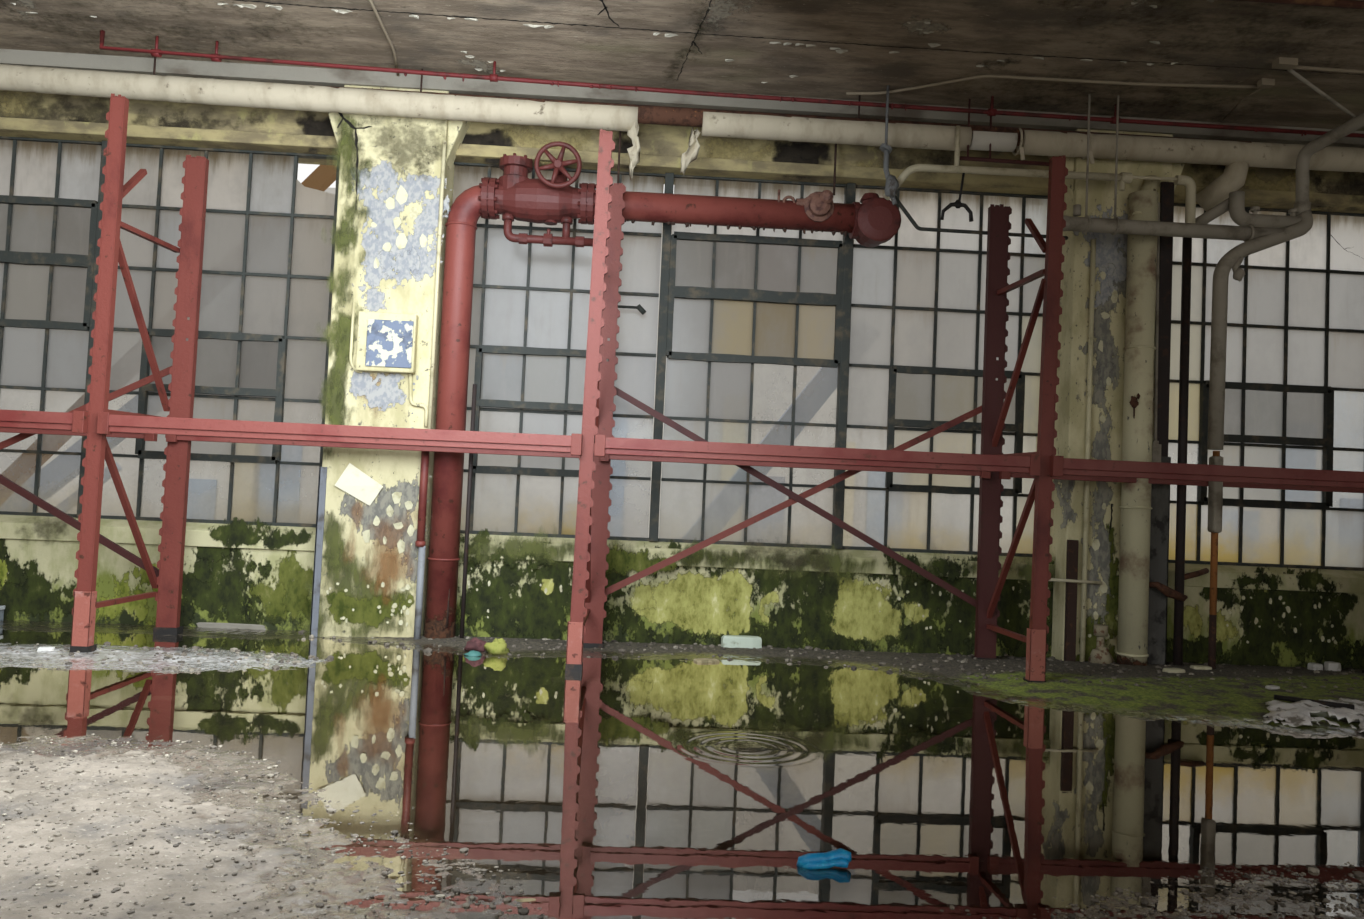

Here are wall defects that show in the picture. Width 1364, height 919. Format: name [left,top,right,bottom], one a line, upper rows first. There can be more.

crack [217,0,1361,80]
peeling [351,160,450,312]
peeling [347,372,419,428]
peeling [1079,271,1126,460]
water stain [0,539,76,622]
water stain [180,517,313,631]
peeling [326,473,432,628]
water stain [456,528,575,640]
water stain [603,540,977,655]
water stain [996,559,1032,657]
peeling [1053,479,1116,640]
water stain [1166,567,1364,669]